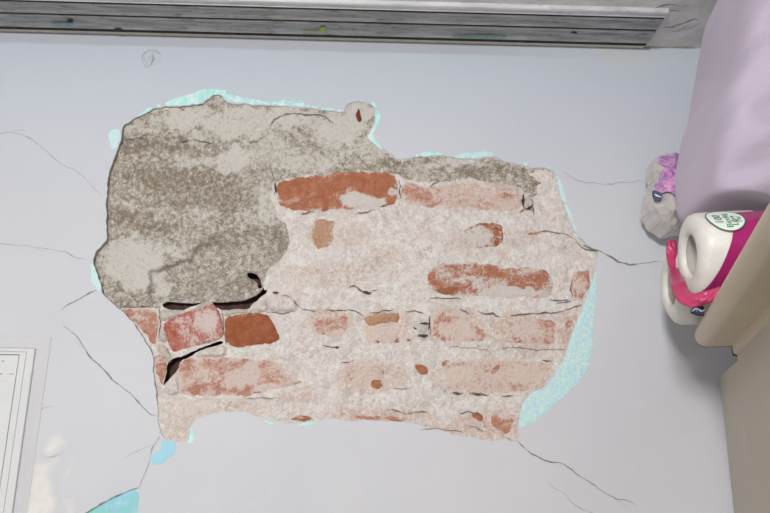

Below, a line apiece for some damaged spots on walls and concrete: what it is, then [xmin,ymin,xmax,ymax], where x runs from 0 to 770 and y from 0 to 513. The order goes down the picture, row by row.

crack [0,130,99,192]
flaking render [90,88,598,465]
crack [584,245,658,266]
crack [64,326,160,488]
crack [512,440,636,513]